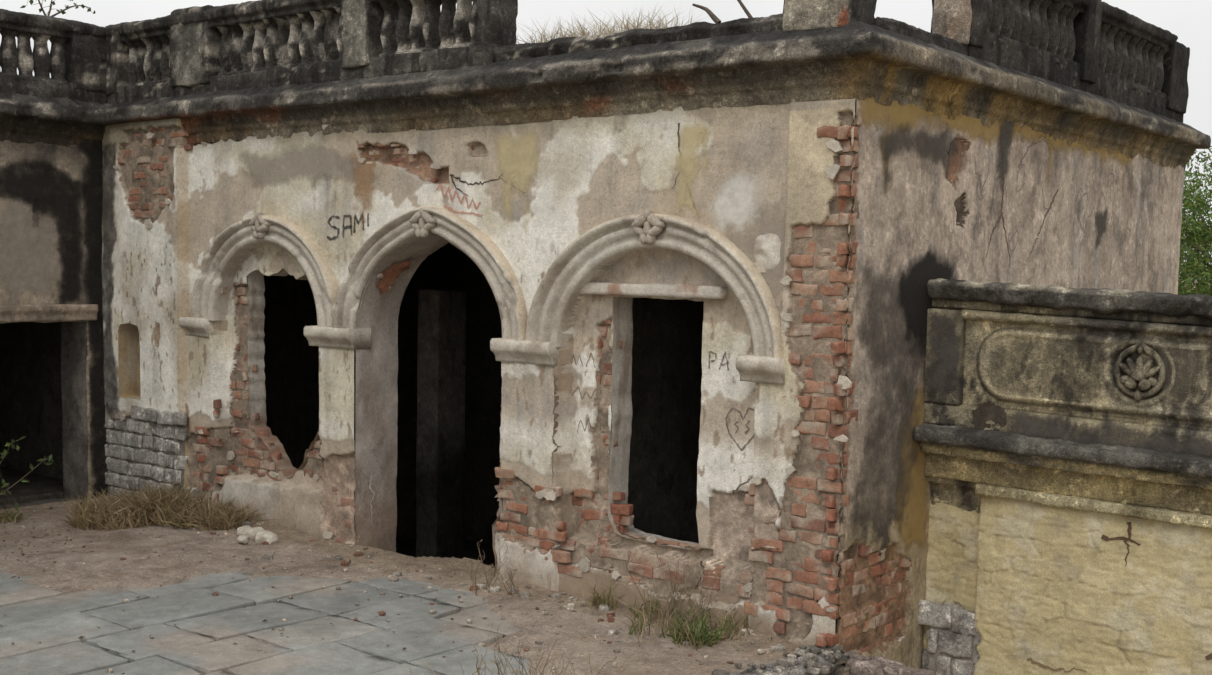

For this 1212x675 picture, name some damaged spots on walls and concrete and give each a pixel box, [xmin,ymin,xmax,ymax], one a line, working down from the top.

spalling [113,124,216,229]
spalling [357,143,450,183]
water stain [861,97,1132,190]
water stain [1096,209,1107,246]
water stain [0,138,118,498]
spalling [104,277,283,506]
spalling [494,111,981,675]
crack [1101,522,1141,566]